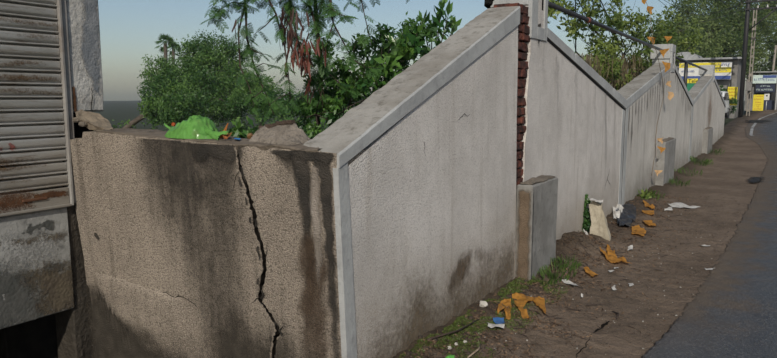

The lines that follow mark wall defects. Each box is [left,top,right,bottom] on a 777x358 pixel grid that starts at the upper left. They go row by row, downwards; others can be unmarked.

rust [0,160,68,213]
peeling [0,220,74,329]
leakage [89,290,170,358]
leakage [143,139,241,262]
leakage [218,315,290,358]
crack [234,150,283,358]
leakage [272,150,339,358]